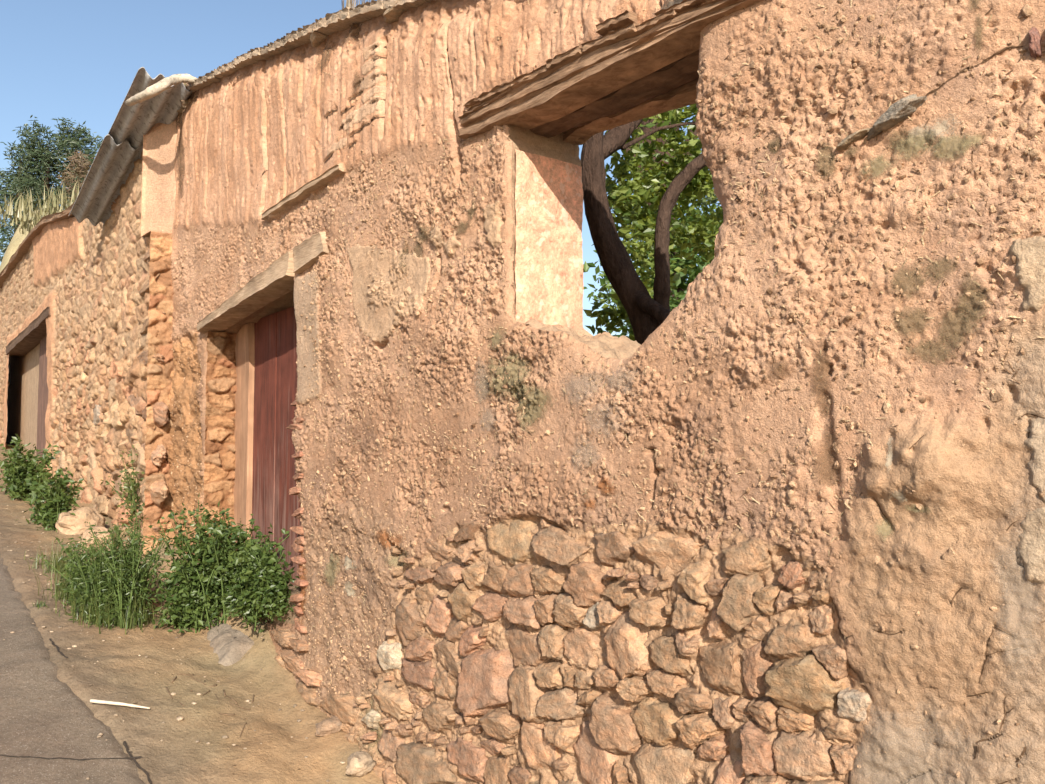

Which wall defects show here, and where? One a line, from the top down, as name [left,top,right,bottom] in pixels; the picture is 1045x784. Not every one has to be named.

crack [925,46,1023,96]
water stain [812,346,832,412]
water stain [815,425,839,486]